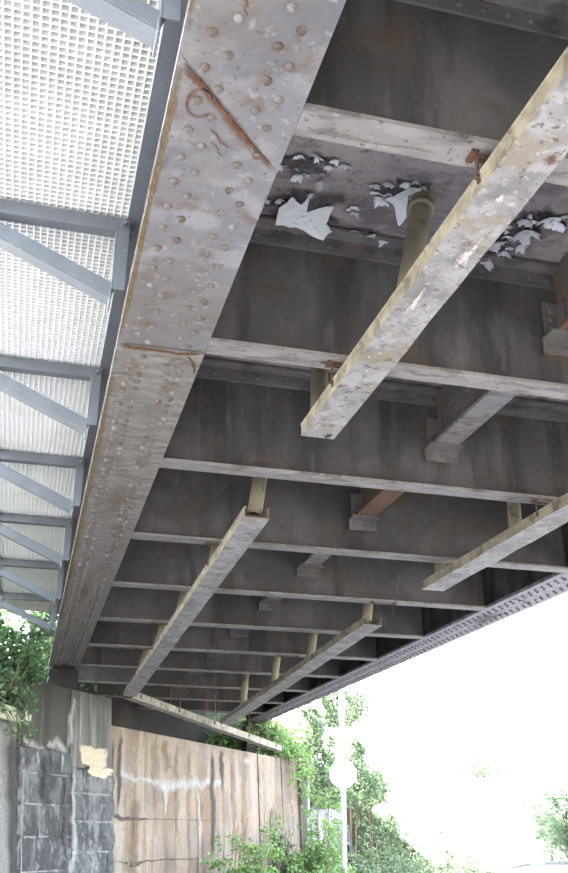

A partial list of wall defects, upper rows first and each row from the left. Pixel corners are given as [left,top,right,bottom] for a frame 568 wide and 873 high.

peeling [264,154,360,241]
peeling [365,179,431,226]
peeling [478,209,568,271]
rust [59,85,178,621]
spalling [79,745,113,779]